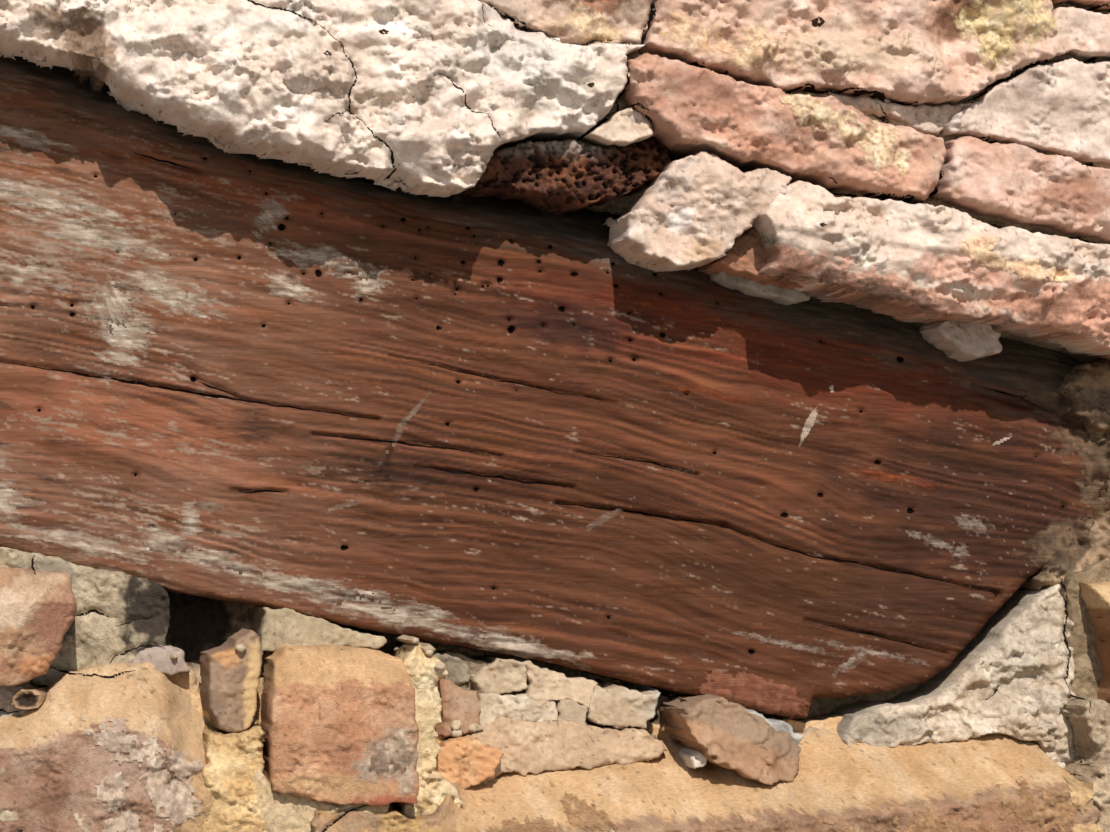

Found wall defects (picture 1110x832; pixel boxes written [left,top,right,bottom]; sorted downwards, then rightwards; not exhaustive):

crack [132,151,195,171]
crack [247,0,396,193]
crack [0,359,993,593]
crack [1059,577,1091,712]